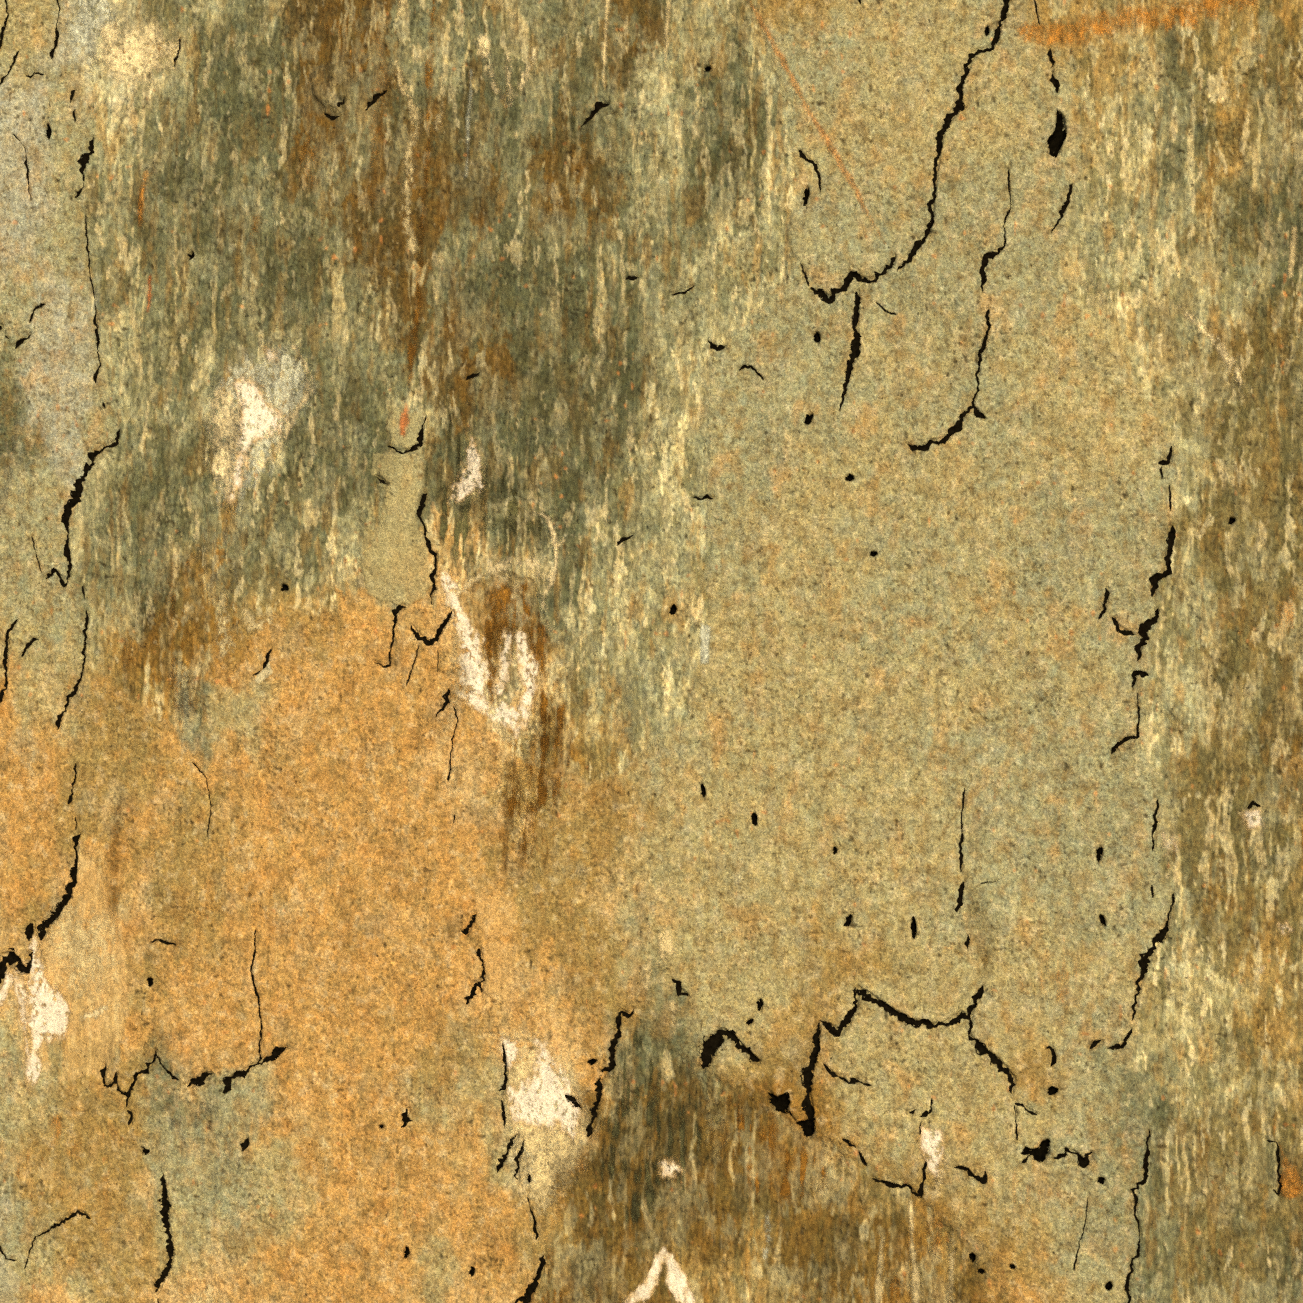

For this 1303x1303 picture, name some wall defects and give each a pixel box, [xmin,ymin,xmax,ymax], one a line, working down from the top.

damp [70,0,175,82]
crack [799,0,1060,451]
crack [31,90,120,730]
damp [211,345,313,504]
damp [426,412,565,745]
crack [1099,445,1176,754]
crack [0,763,81,983]
damp [0,899,116,1084]
crack [100,929,287,1125]
damp [499,1031,588,1215]
crack [800,985,1093,1270]
damp [626,1247,695,1303]